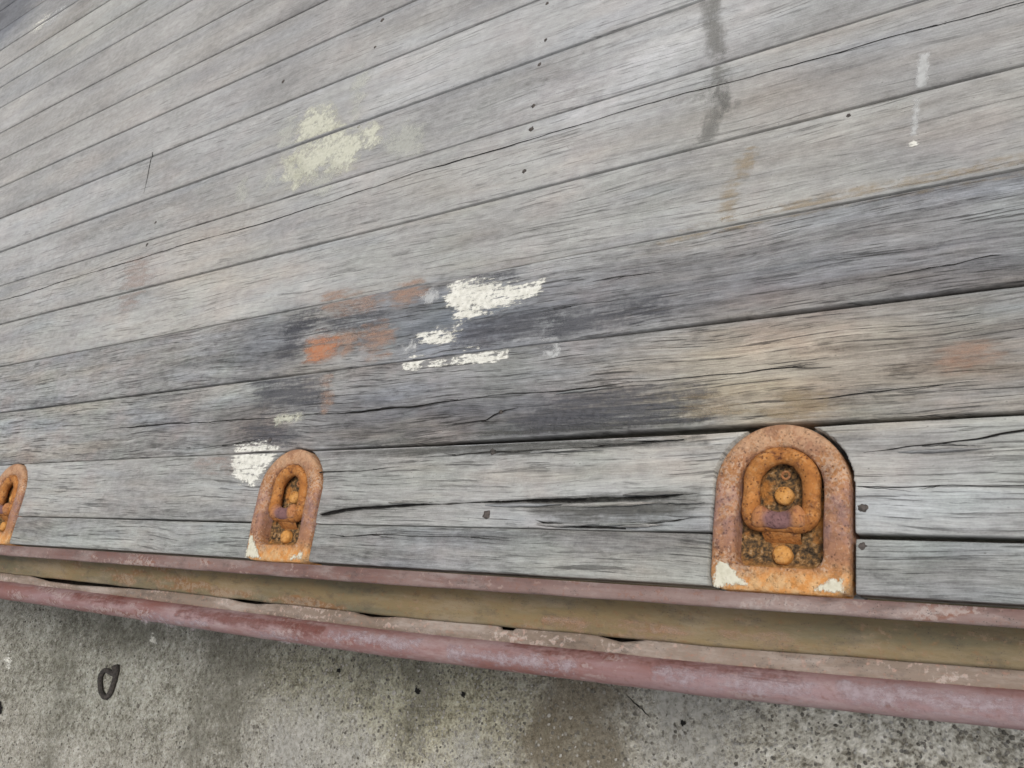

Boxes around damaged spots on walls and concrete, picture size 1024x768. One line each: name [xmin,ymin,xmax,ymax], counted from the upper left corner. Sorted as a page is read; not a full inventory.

corrosion [305,332,354,362]
crack [100,363,826,450]
crack [431,436,694,457]
crack [320,491,705,540]